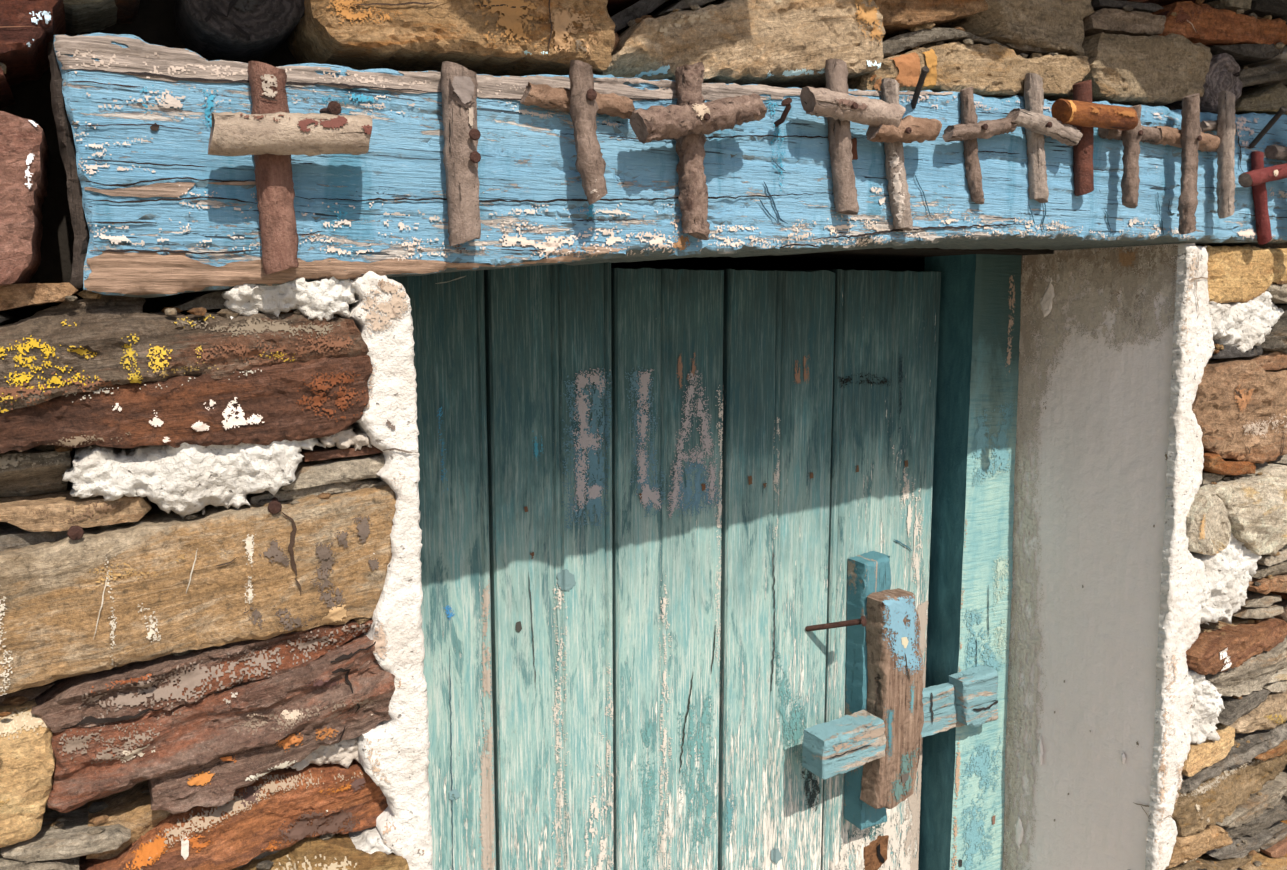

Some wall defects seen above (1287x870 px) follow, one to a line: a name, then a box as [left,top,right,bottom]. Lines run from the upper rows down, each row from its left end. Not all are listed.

spalling [546,6,603,57]
spalling [894,22,973,56]
peeling [54,35,441,134]
peeling [468,75,570,128]
peeling [593,77,677,101]
peeling [692,83,802,120]
rust [870,49,937,91]
peeling [899,91,955,109]
peeling [1067,100,1179,122]
peeling [65,121,1209,319]
peeling [1236,229,1285,248]
spalling [951,737,961,870]